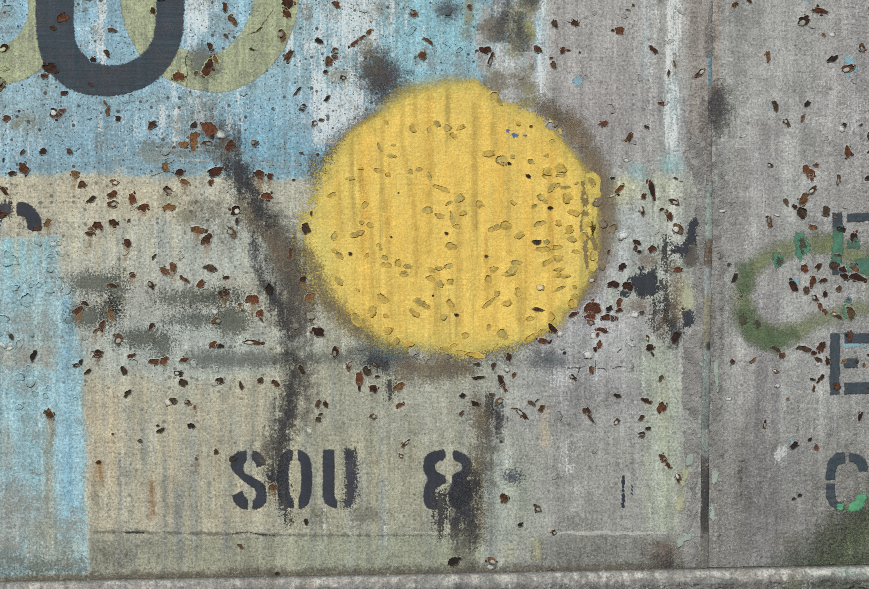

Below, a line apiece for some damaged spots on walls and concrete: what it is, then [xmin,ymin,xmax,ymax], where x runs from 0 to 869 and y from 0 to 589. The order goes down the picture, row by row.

spalling [826,54,856,73]
spalling [225,204,242,239]
spalling [300,210,313,235]
peeling [583,172,617,283]
spalling [663,197,684,234]
peeling [765,197,811,262]
spalling [201,263,218,274]
water stain [224,153,546,528]
spalling [72,358,92,375]
spalling [173,370,190,387]
spalling [488,393,539,420]
water stain [428,393,508,570]